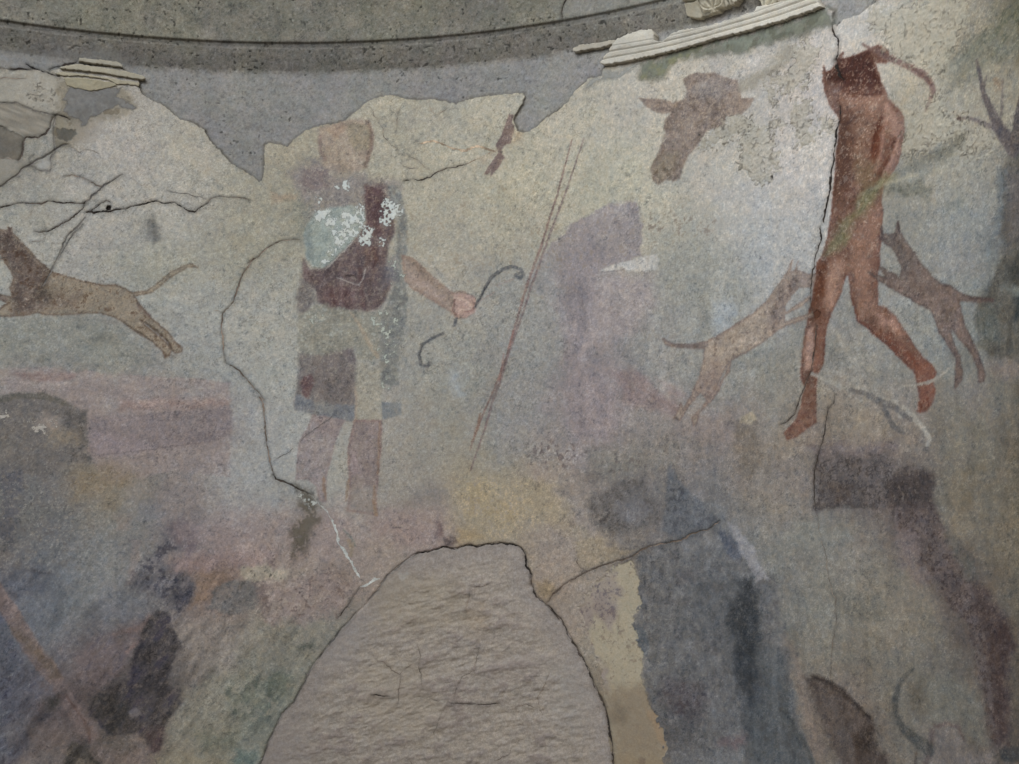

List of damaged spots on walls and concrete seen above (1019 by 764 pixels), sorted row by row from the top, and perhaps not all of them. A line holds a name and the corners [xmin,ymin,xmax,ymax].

crack [832,26,844,80]
crack [0,62,248,285]
peeling [314,196,404,266]
peeling [370,310,398,364]
crack [779,108,841,426]
crack [215,239,718,764]